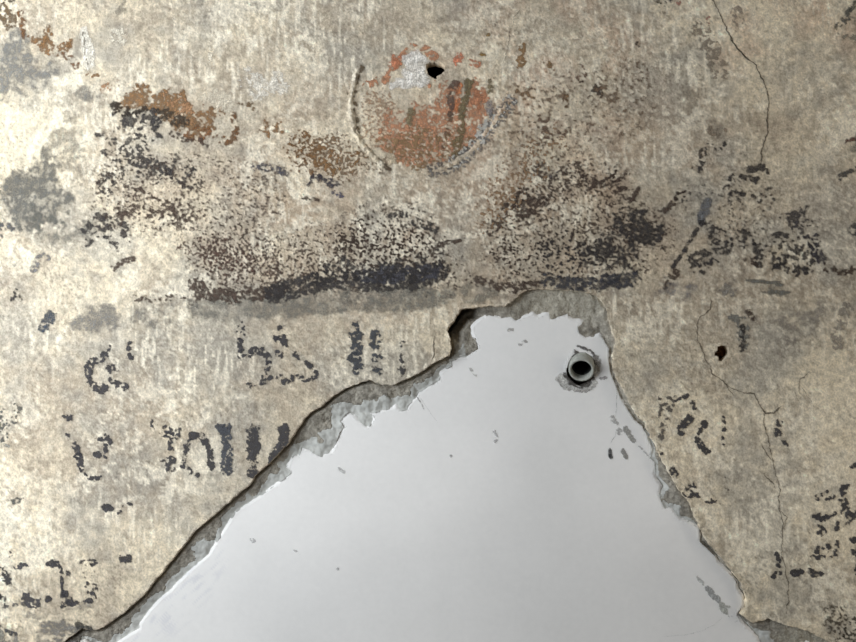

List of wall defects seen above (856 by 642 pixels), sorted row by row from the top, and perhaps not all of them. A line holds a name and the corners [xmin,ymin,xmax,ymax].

damp [0,30,58,94]
rust [0,0,255,148]
rust [259,119,386,186]
damp [0,108,856,306]
rust [515,42,527,69]
rust [474,61,655,234]
crack [713,0,770,164]
damp [38,310,57,332]
damp [728,310,757,352]
flaking render [69,290,827,642]
crack [697,300,790,614]
damp [824,605,856,642]